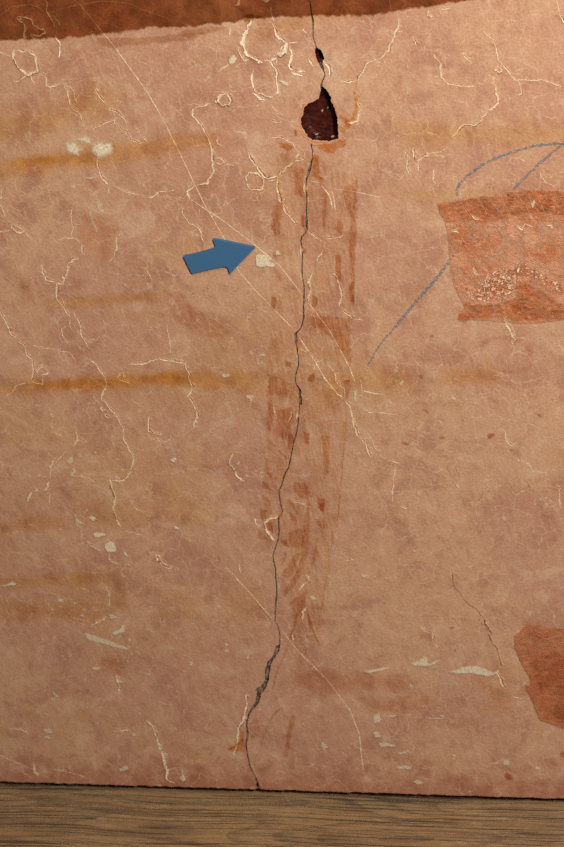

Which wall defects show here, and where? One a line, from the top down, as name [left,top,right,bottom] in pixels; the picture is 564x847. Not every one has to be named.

crack [232,144,409,785]